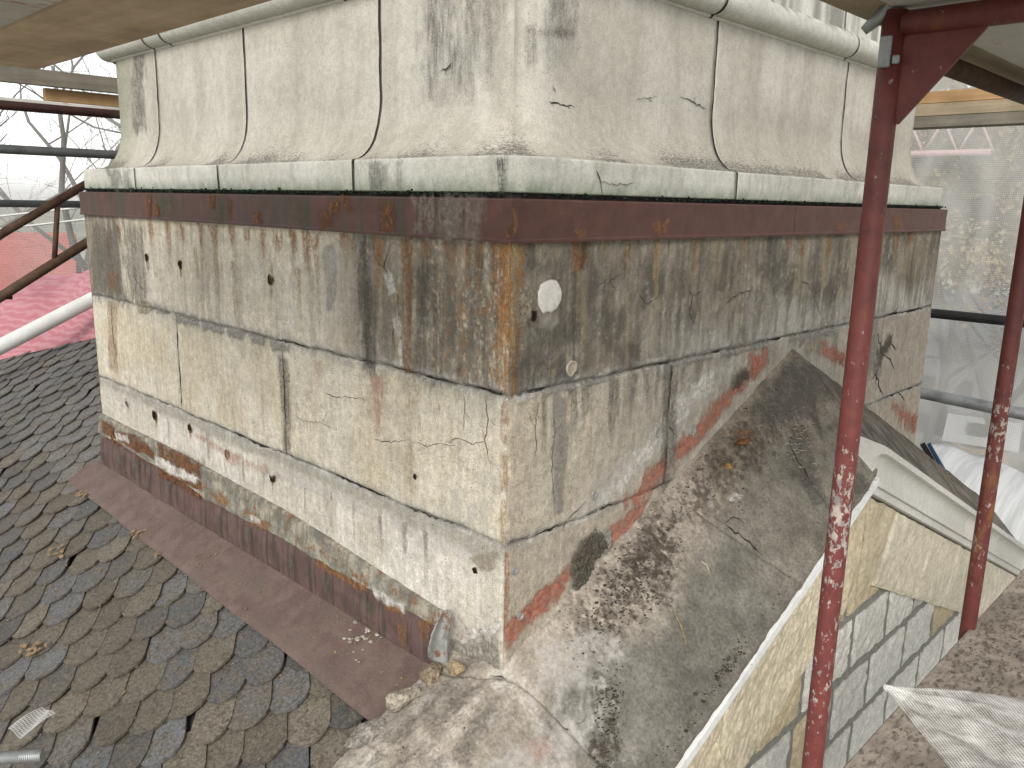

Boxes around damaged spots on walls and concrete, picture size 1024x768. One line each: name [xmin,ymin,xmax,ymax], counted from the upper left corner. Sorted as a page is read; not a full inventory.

corrosion [102,420,228,506]
corrosion [208,195,349,270]
water stain [354,237,383,395]
corrosion [466,210,524,397]
crack [161,248,842,580]
water stain [583,361,721,514]
crack [871,306,922,400]